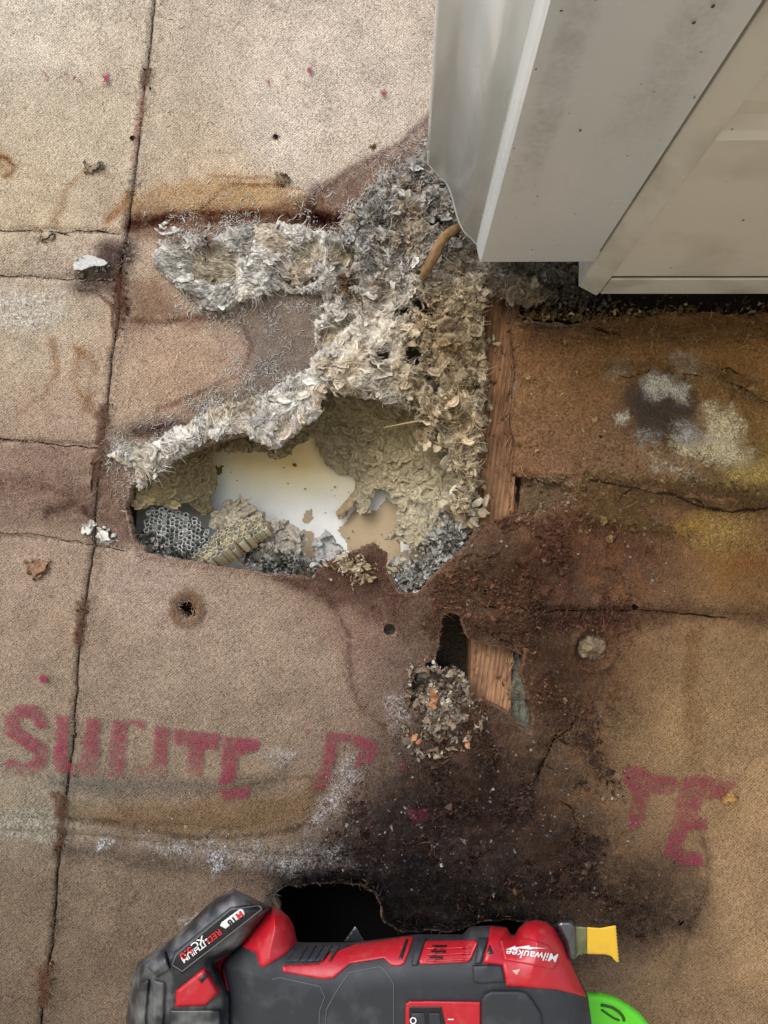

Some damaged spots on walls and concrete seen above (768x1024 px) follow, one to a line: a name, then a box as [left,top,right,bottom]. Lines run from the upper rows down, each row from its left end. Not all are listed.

peeling [274,171,291,186]
damp [612,352,768,487]
peeling [294,498,438,591]
damp [266,494,756,923]